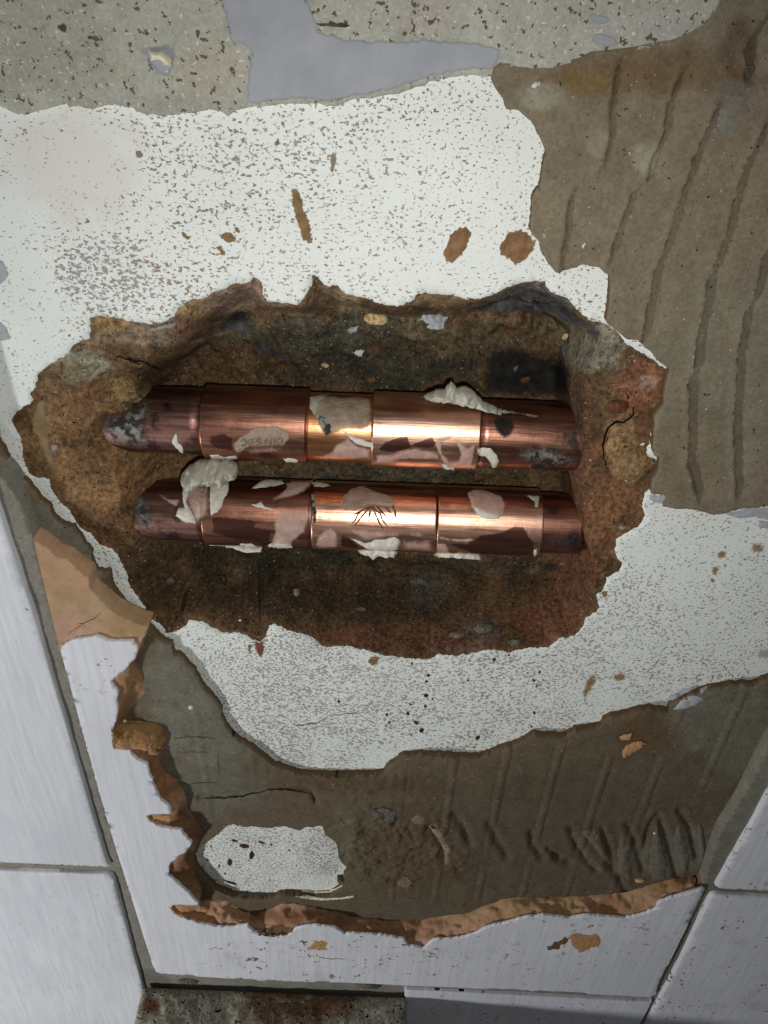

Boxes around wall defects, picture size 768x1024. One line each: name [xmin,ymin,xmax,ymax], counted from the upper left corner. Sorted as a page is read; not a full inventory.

peeling [500,229,535,265]
crack [602,393,634,470]
spalling [12,275,666,665]
peeling [666,685,707,710]
peeling [619,733,646,758]
crack [113,637,696,947]
peeling [147,813,171,826]
peeling [299,885,354,901]
peeling [169,905,215,924]
peeling [255,924,294,938]
peeling [547,925,601,953]